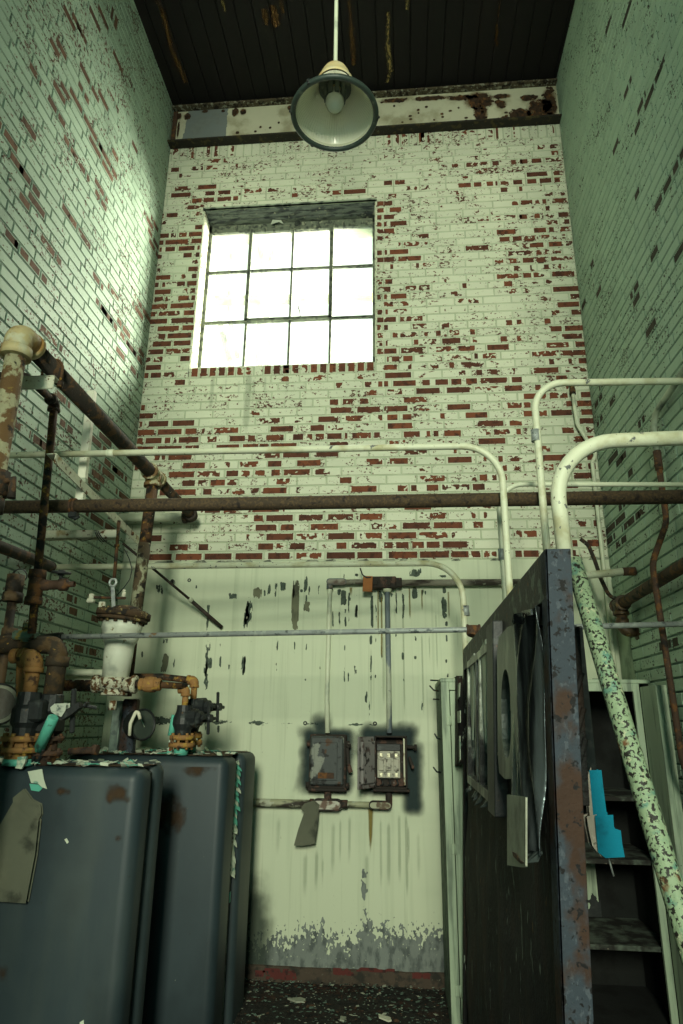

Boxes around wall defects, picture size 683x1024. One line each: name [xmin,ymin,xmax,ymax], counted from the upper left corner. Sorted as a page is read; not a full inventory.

peeling [0,121,45,218]
peeling [29,61,119,211]
rust [380,86,558,123]
peeling [634,54,665,136]
peeling [5,228,47,284]
peeling [62,203,91,250]
peeling [93,109,279,385]
peeling [137,125,615,495]
peeling [88,432,138,499]
peeling [567,449,633,488]
peeling [149,507,497,680]
peeling [204,644,246,690]